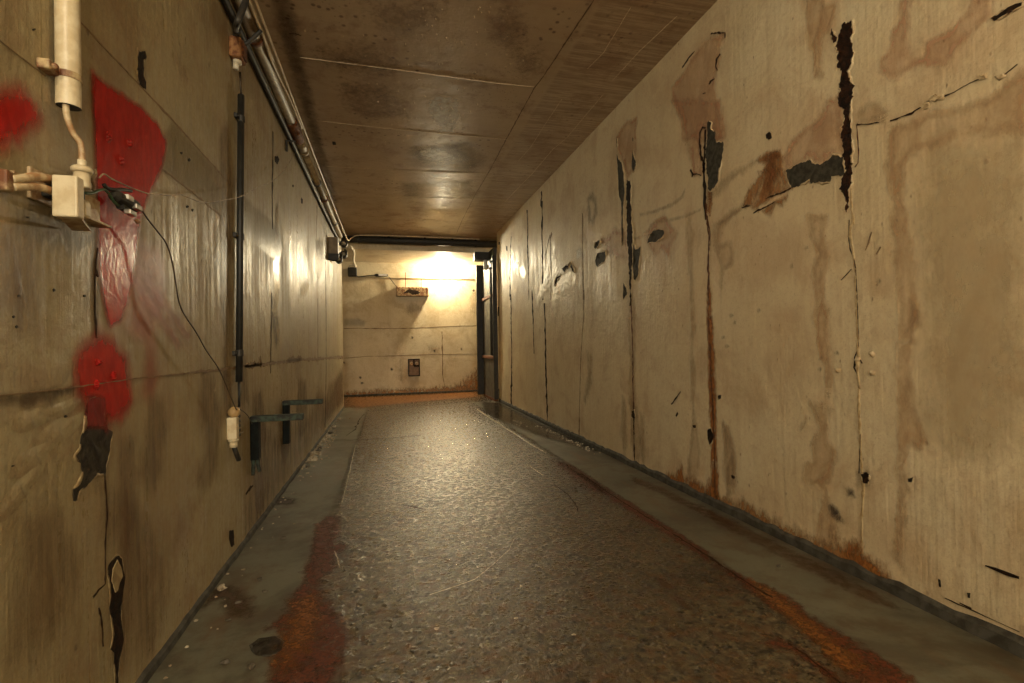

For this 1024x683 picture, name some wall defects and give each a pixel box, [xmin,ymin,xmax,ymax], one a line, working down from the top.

spalling [705,121,724,192]
spalling [786,19,856,213]
crack [855,79,979,167]
peeling [594,240,606,267]
crack [841,220,862,374]
peeling [73,396,113,502]
rust [668,289,888,579]
peeling [107,554,125,683]
rust [271,594,322,668]
rust [557,461,914,683]